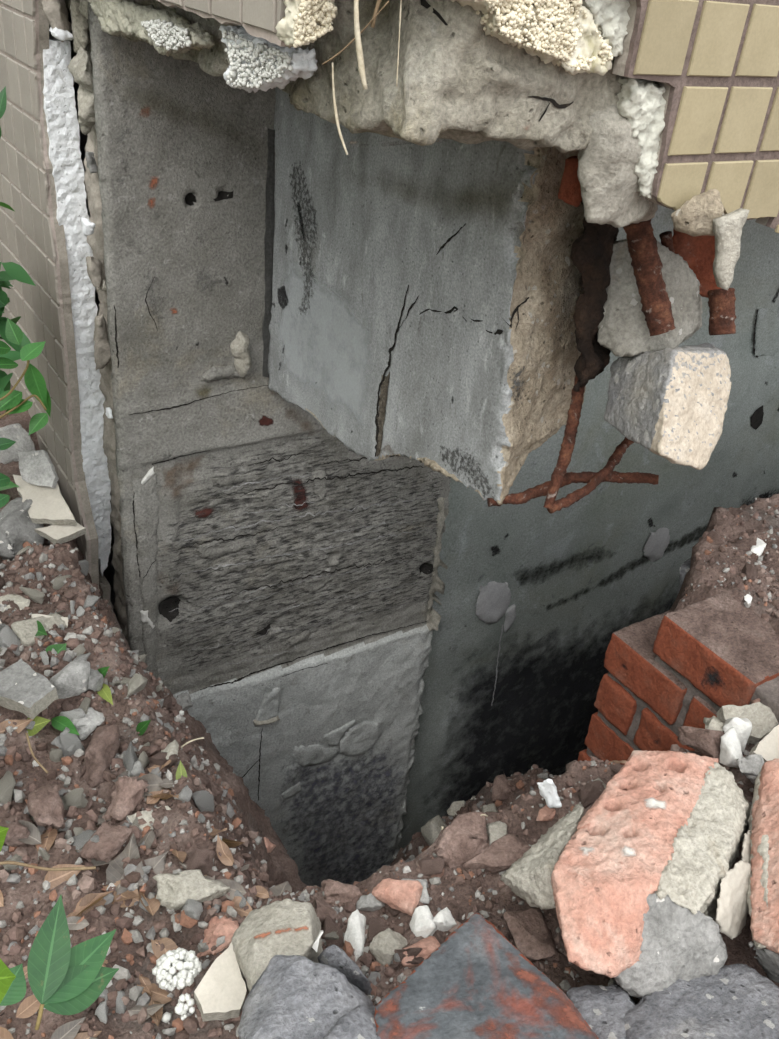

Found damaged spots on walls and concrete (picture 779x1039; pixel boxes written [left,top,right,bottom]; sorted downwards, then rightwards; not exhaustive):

peeling [285,162,317,315]
crack [436,223,466,255]
peeling [272,286,288,309]
rust [623,219,676,336]
rust [707,288,736,335]
crack [375,285,529,457]
rust [487,375,659,514]
peeling [140,437,448,671]
damp [518,551,602,584]
damp [547,557,649,609]
damp [664,525,707,553]